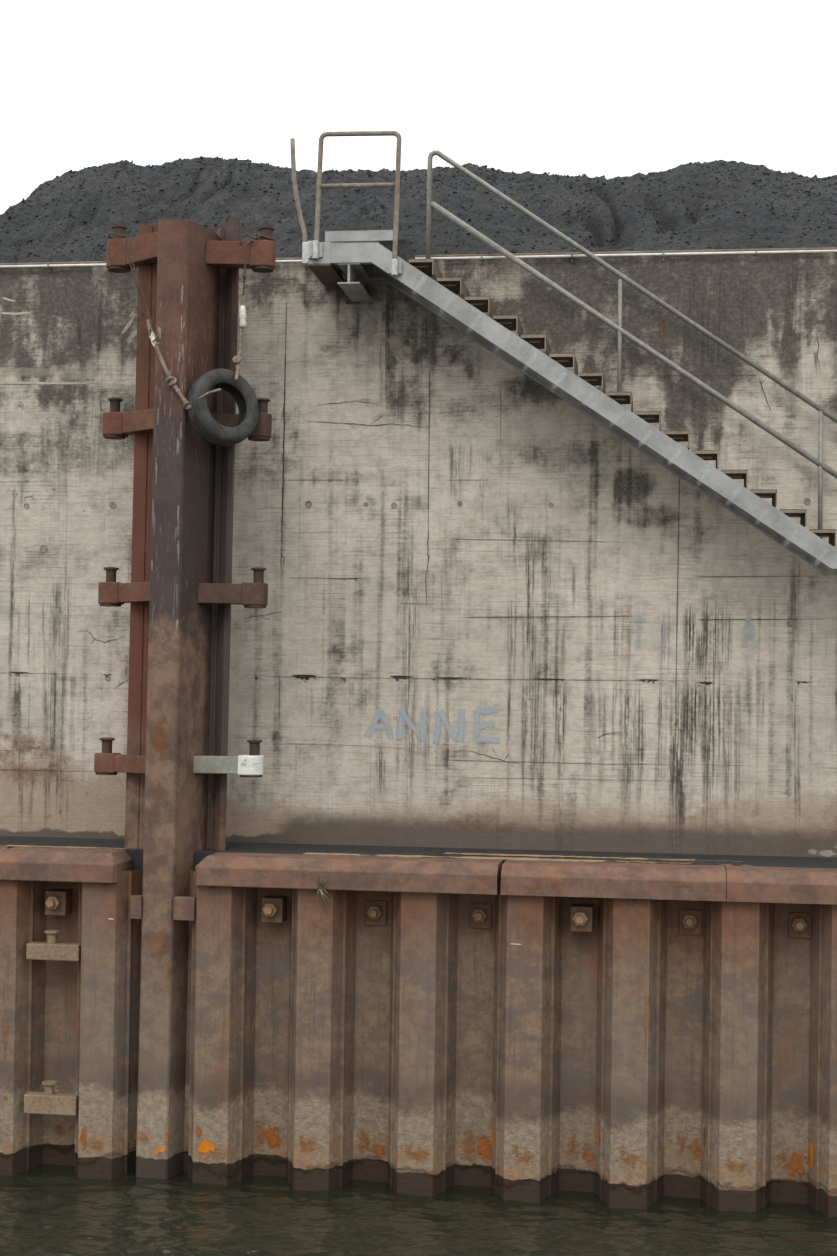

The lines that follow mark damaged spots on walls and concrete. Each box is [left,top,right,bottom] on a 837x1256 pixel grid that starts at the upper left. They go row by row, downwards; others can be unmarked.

leakage [121,312,137,358]
leakage [685,612,730,664]
leakage [670,694,696,810]
leakage [705,697,729,799]
leakage [808,846,837,857]
rust [191,1110,221,1156]
rust [256,1125,281,1147]
rust [463,1124,495,1163]
rust [781,1139,814,1178]